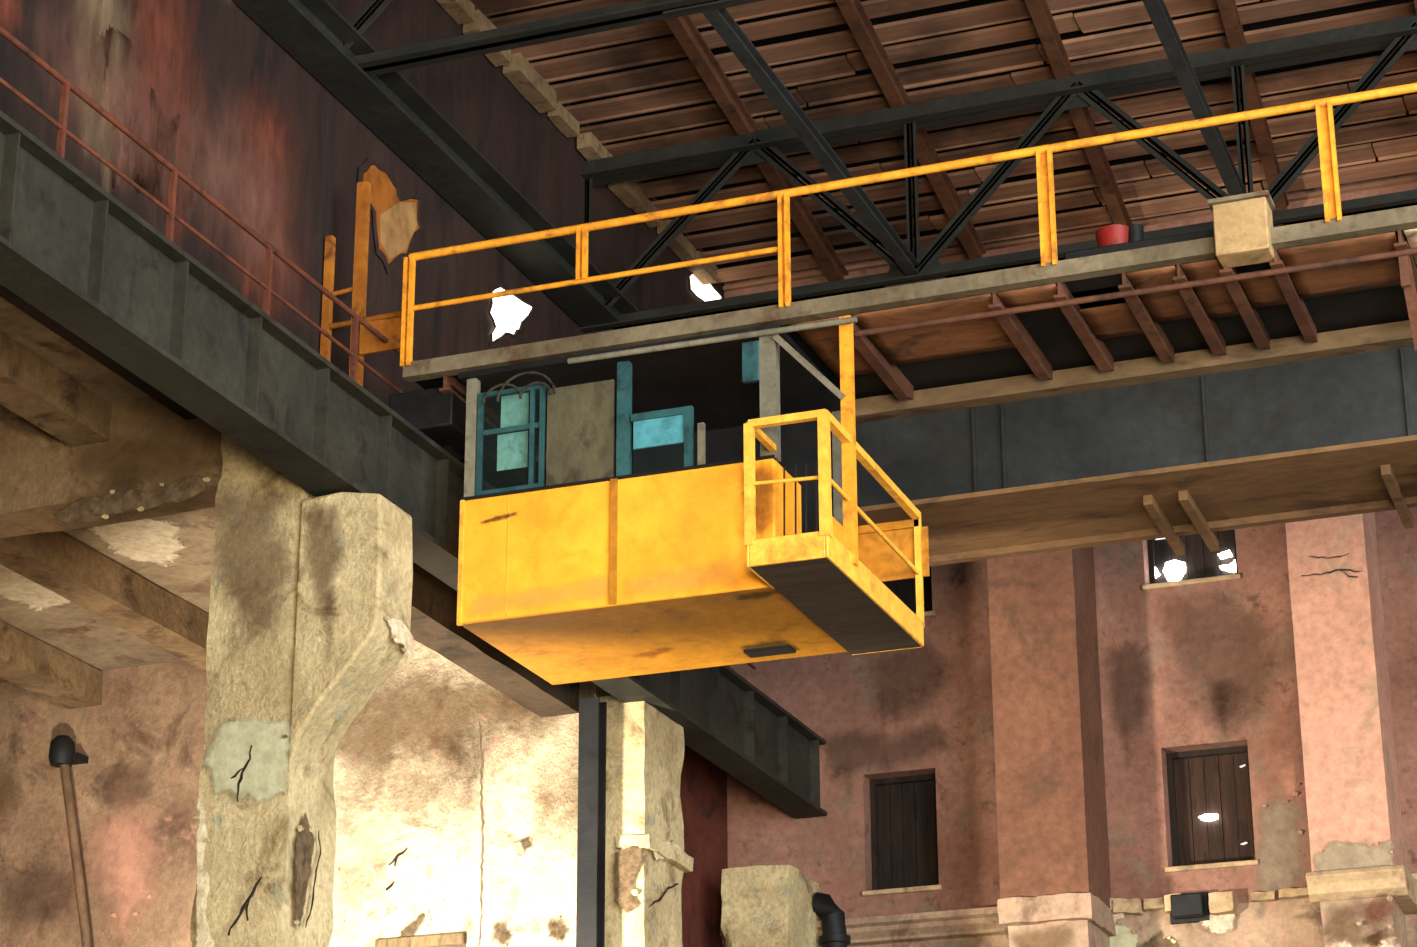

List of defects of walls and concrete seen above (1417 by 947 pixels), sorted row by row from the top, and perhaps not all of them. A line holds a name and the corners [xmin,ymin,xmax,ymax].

leakage [221,499,279,619]
leakage [310,513,338,600]
crack [1301,553,1361,578]
crack [231,745,252,802]
crack [227,876,262,936]
spalling [614,840,682,913]
spalling [1356,895,1401,947]